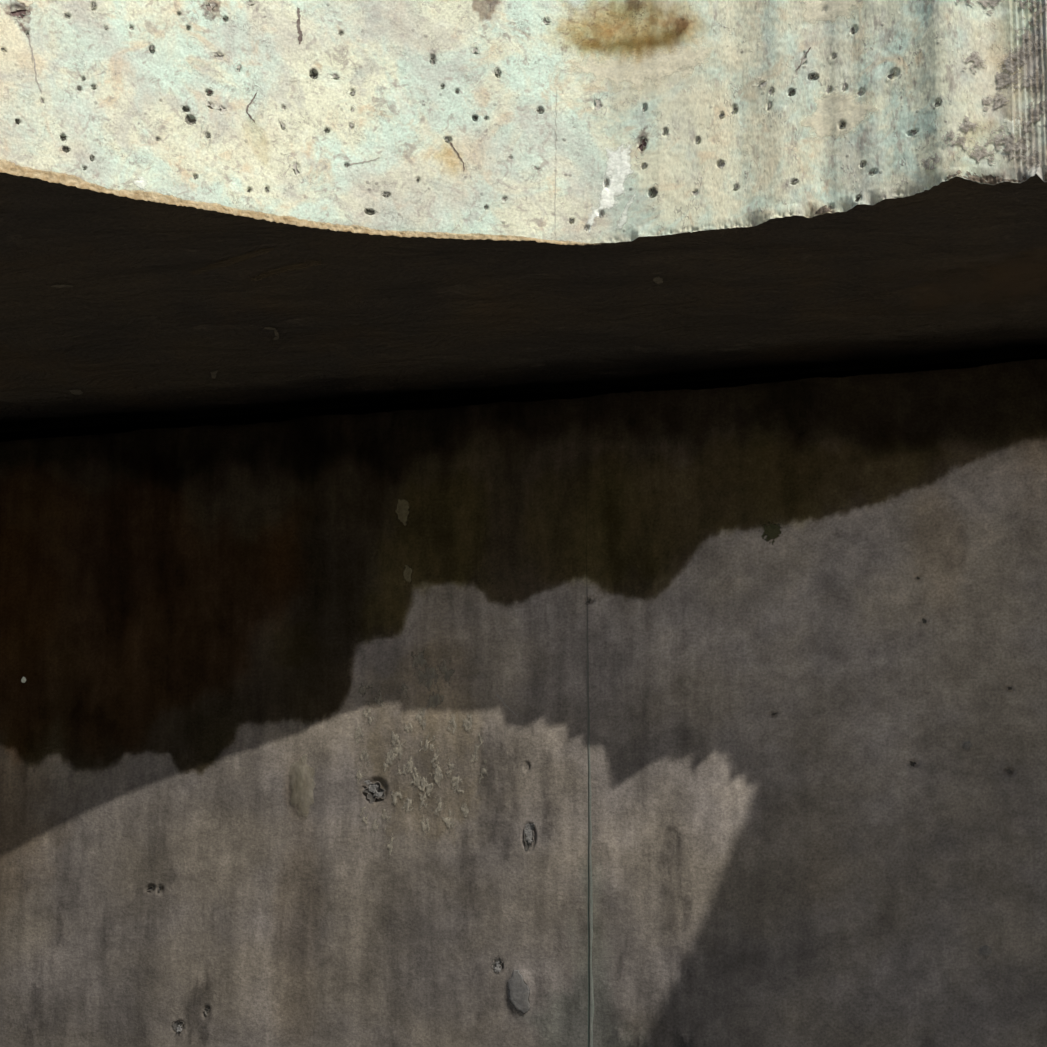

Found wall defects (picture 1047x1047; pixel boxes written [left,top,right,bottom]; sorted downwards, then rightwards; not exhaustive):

leakage [0,356,1047,771]